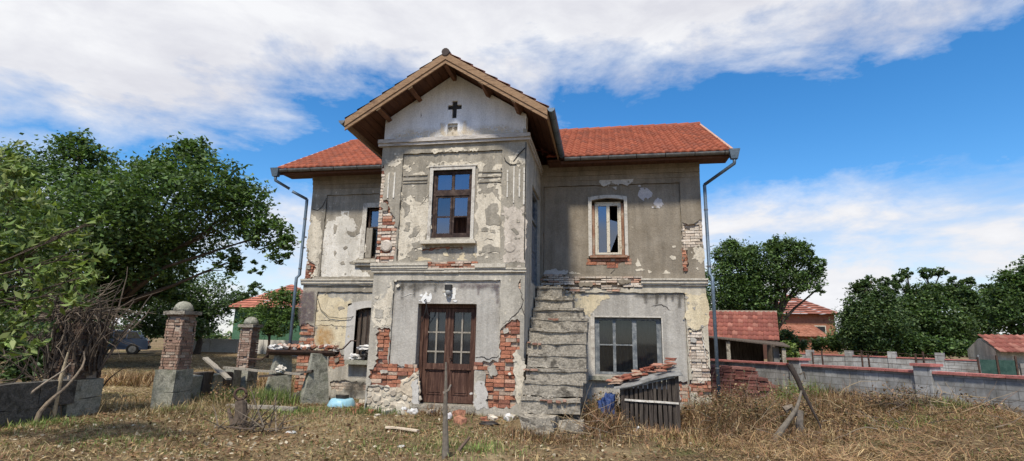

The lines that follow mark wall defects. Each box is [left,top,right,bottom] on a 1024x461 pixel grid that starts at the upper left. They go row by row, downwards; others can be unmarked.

peeling [304,147,528,289]
spalling [541,220,706,317]
peeling [599,174,664,209]
peeling [294,280,422,410]
spalling [470,319,541,410]
peeling [679,293,711,402]